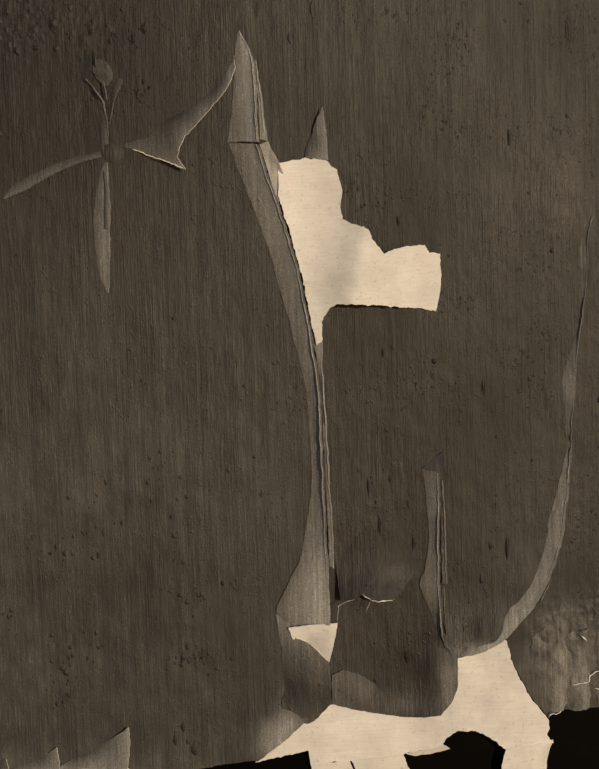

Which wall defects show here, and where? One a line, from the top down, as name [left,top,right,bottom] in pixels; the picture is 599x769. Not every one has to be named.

peeling [3,31,441,345]
peeling [229,143,594,769]
peeling [0,727,130,769]